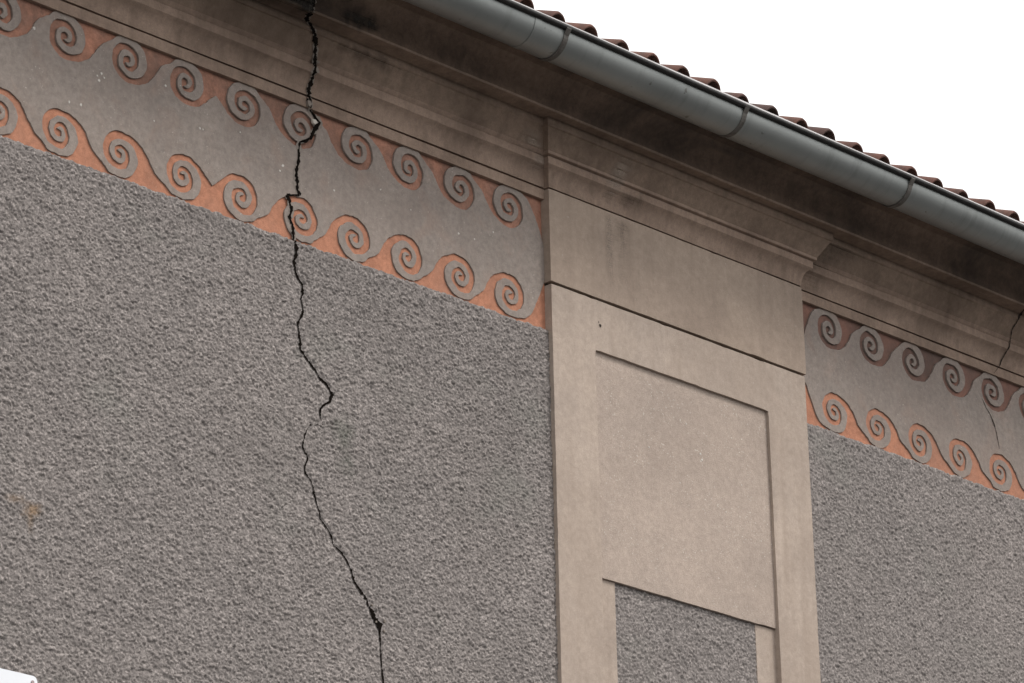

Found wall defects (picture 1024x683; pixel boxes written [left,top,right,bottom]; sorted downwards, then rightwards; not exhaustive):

crack [285,0,386,683]